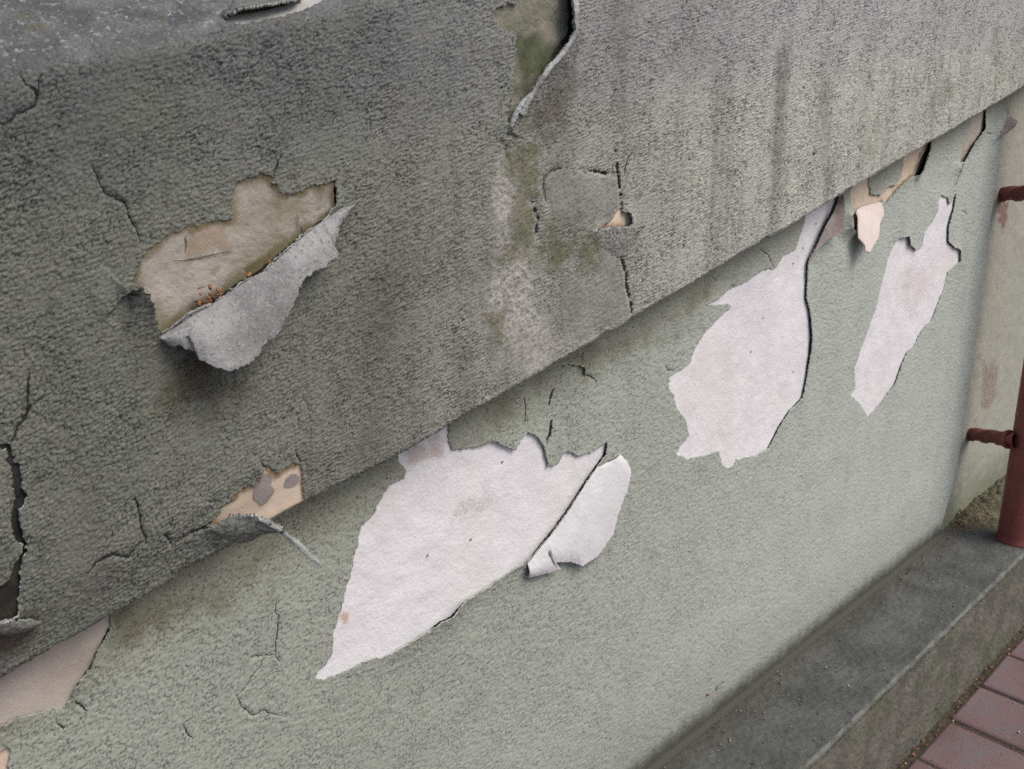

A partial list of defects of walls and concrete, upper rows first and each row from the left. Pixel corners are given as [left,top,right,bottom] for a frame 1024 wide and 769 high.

peeling [492,0,580,134]
crack [92,164,142,244]
peeling [130,173,357,372]
crack [590,147,631,205]
crack [619,257,632,313]
peeling [669,143,930,468]
peeling [850,110,985,416]
crack [0,373,44,543]
crack [88,495,212,575]
peeling [208,461,320,564]
peeling [316,425,631,679]
peeling [0,615,111,726]